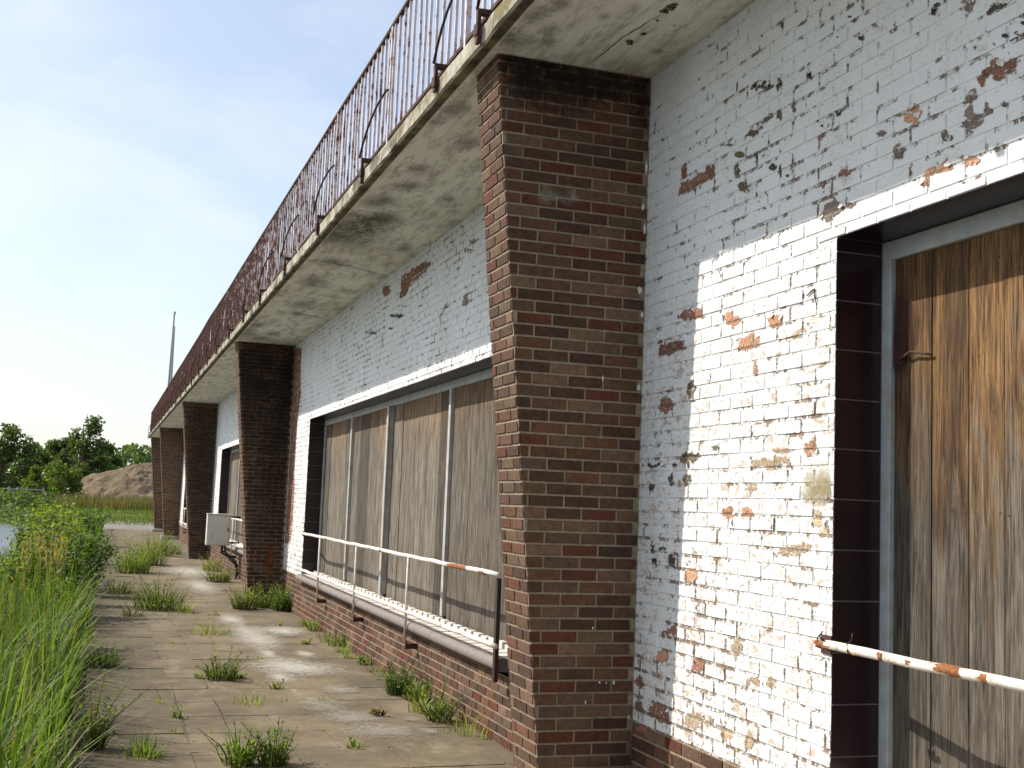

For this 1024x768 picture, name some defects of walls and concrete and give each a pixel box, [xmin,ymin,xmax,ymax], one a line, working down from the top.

peeling [938,21,1024,144]
peeling [721,97,796,200]
peeling [678,163,715,196]
peeling [918,154,979,186]
peeling [819,197,855,222]
peeling [354,261,431,348]
peeling [720,310,760,376]
peeling [659,376,697,415]
peeling [642,449,701,486]
peeling [744,446,790,493]
peeling [722,506,754,523]
rust [933,662,961,678]